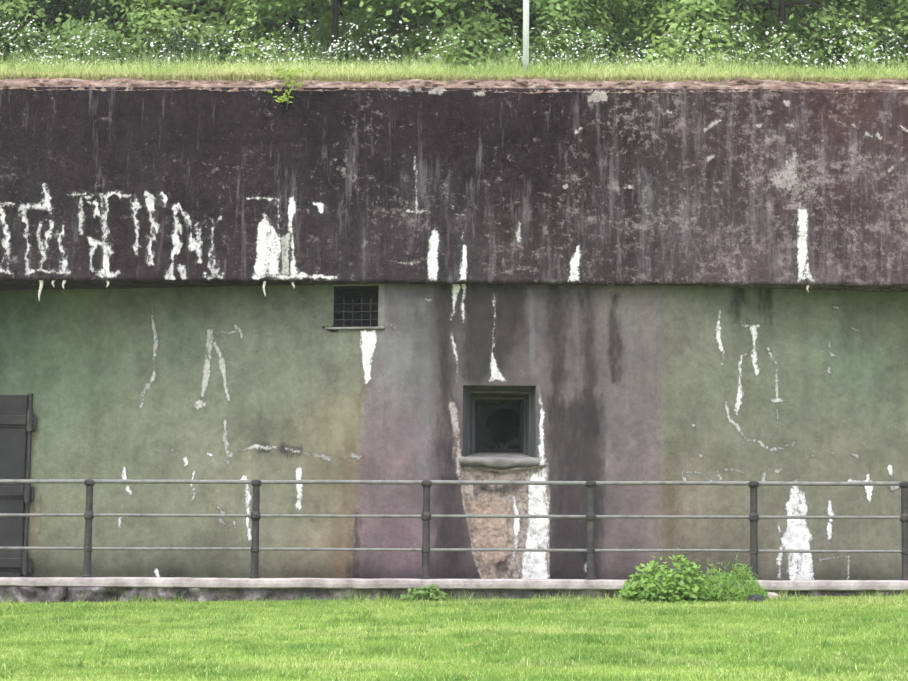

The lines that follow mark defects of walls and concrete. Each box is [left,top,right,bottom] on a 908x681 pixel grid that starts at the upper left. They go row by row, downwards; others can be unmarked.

water stain [0,183,71,301]
water stain [67,190,224,288]
water stain [608,294,621,382]
water stain [548,244,603,578]
spalling [447,394,551,579]